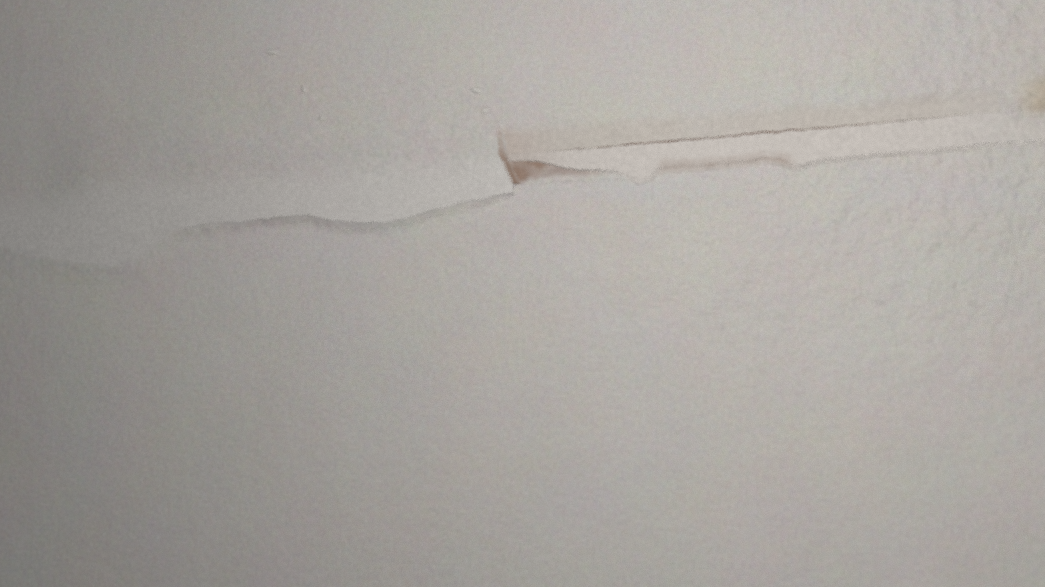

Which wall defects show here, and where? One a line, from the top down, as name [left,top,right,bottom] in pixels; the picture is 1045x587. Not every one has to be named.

crack [545,115,957,152]